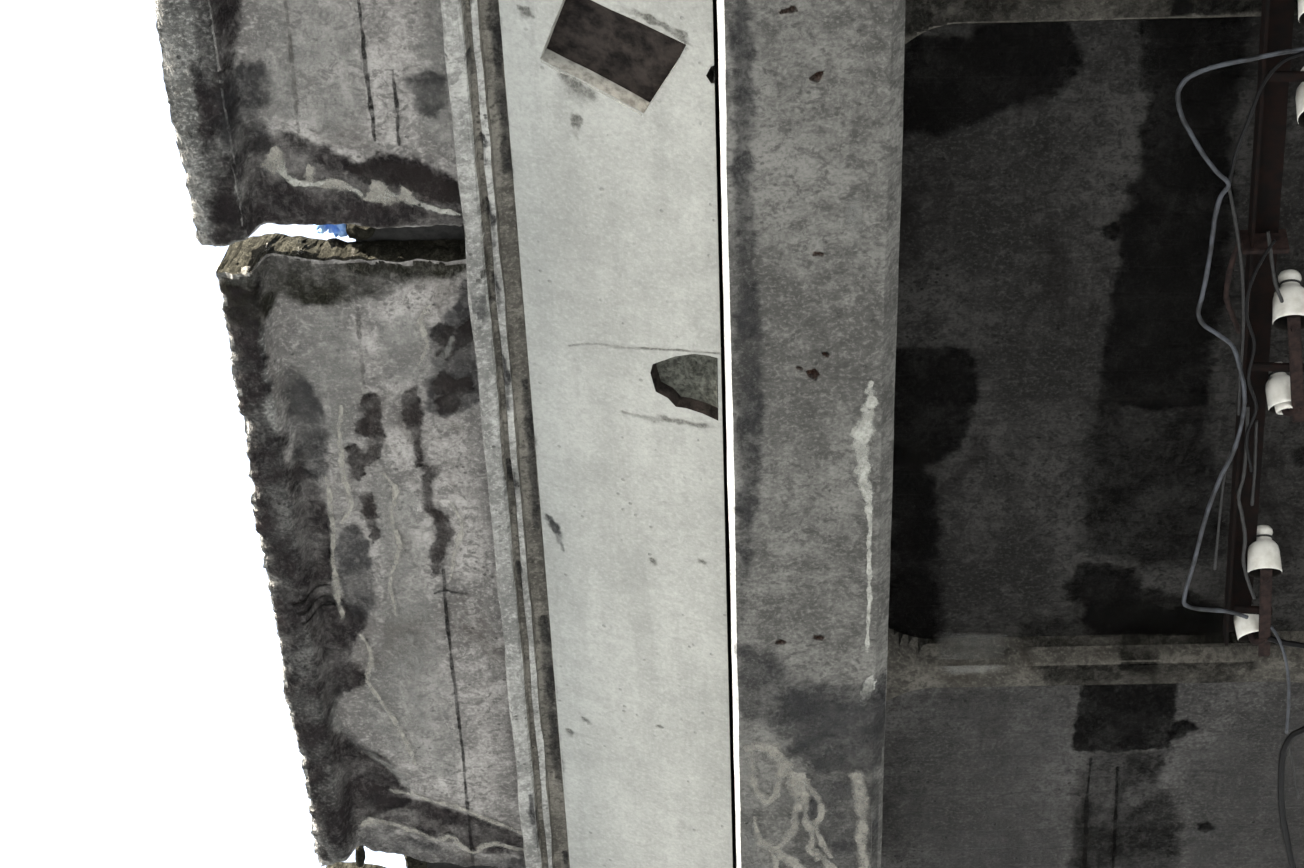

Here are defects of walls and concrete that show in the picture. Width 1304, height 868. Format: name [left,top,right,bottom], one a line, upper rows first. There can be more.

crack [357,0,400,146]
damp [221,260,527,868]
spalling [651,348,723,420]
damp [851,347,978,653]
damp [1038,0,1262,868]
crack [434,569,475,867]
damp [735,647,886,868]